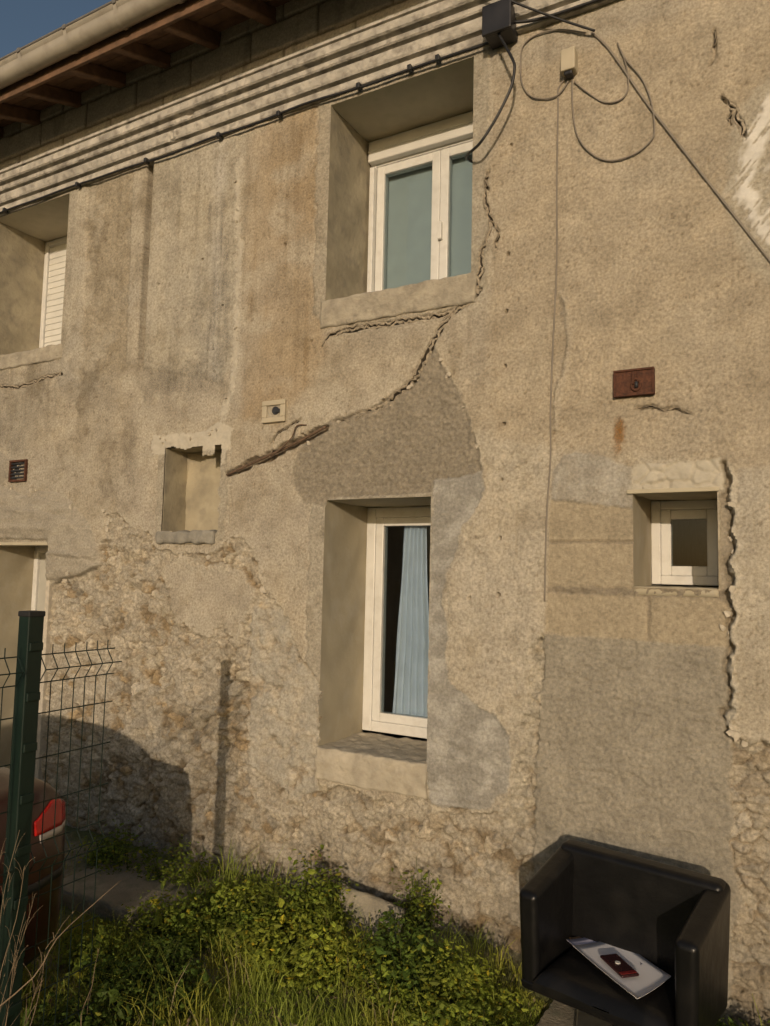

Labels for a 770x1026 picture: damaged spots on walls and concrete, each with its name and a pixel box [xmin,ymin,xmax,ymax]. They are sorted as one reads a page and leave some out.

crack [707,29,718,66]
crack [720,95,746,137]
crack [321,171,500,424]
flaking render [293,347,482,506]
flaking render [42,509,546,954]
flaking render [726,729,770,1026]